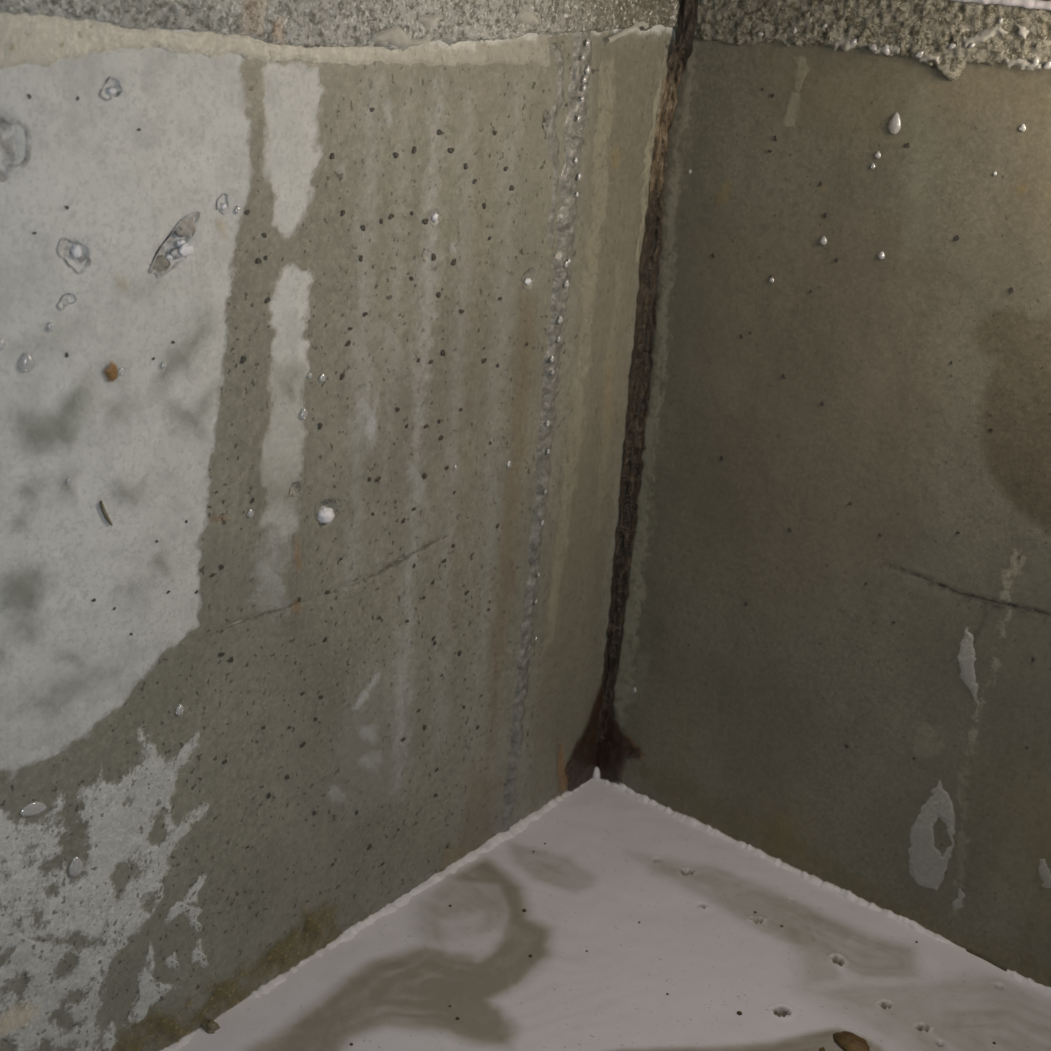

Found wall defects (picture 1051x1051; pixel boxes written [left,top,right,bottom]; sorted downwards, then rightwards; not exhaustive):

crack [595,0,698,743]
water stain [0,10,678,1051]
water stain [613,37,1051,986]
crack [882,563,1051,618]
peeling [957,627,979,704]
corrosion [557,684,645,792]
peeling [908,780,956,890]